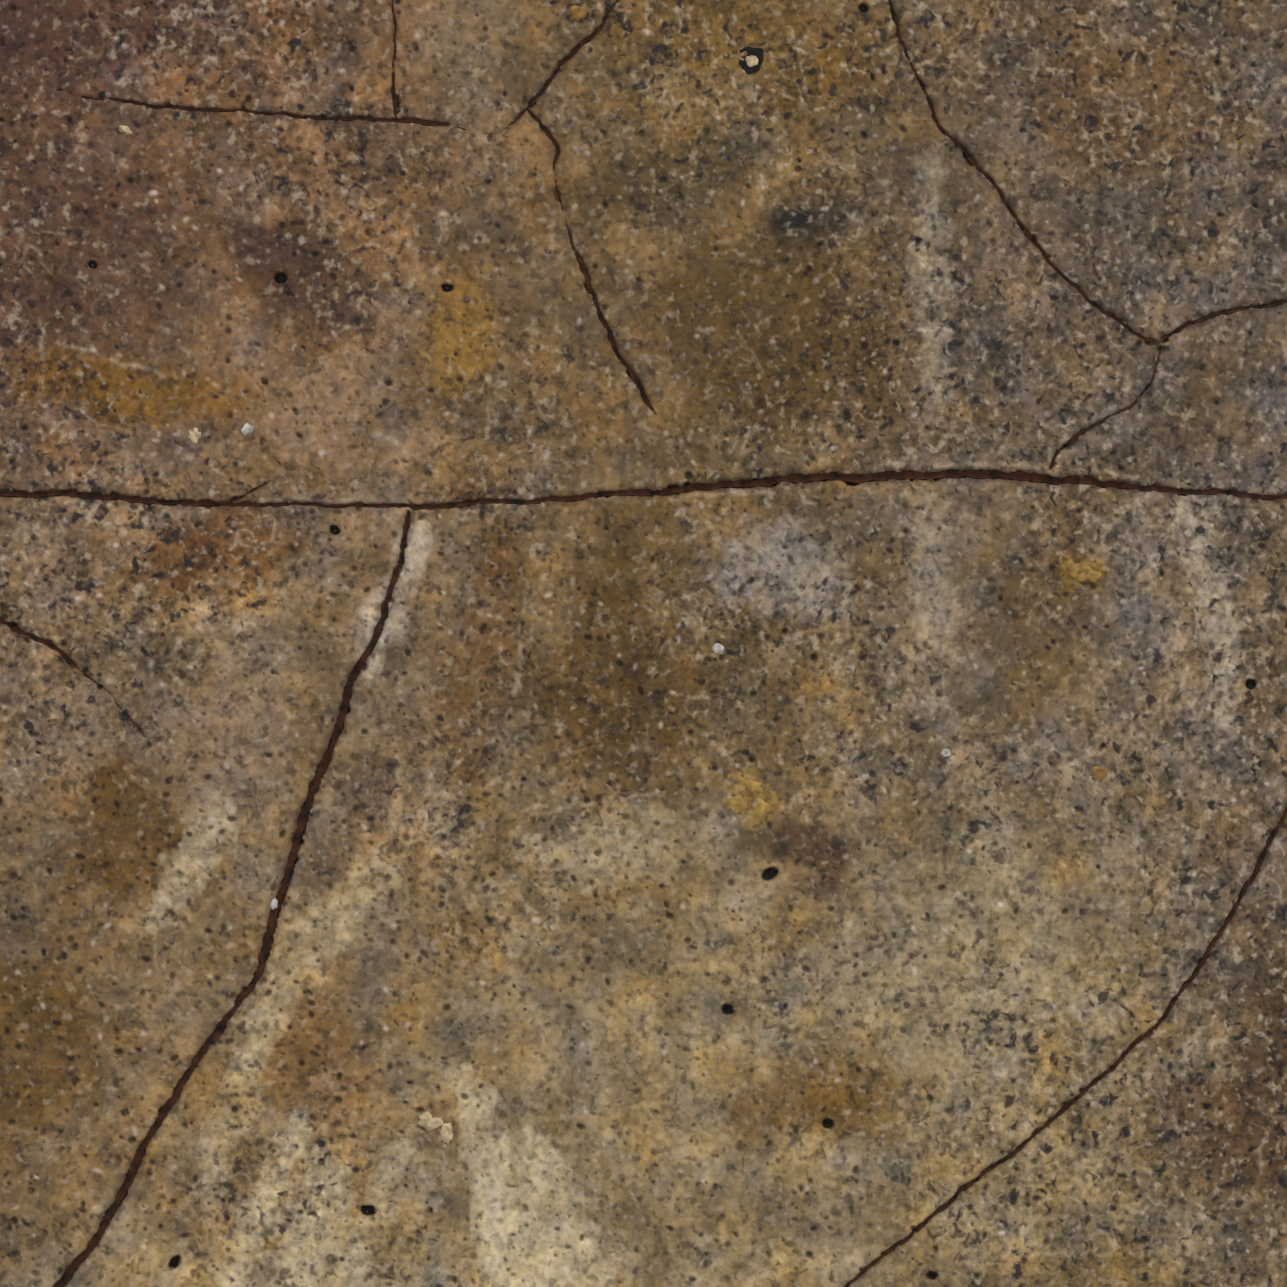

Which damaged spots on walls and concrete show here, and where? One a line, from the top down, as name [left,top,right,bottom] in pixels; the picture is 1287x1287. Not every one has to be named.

crack [59,0,656,414]
crack [888,0,1287,470]
crack [0,470,1287,1287]